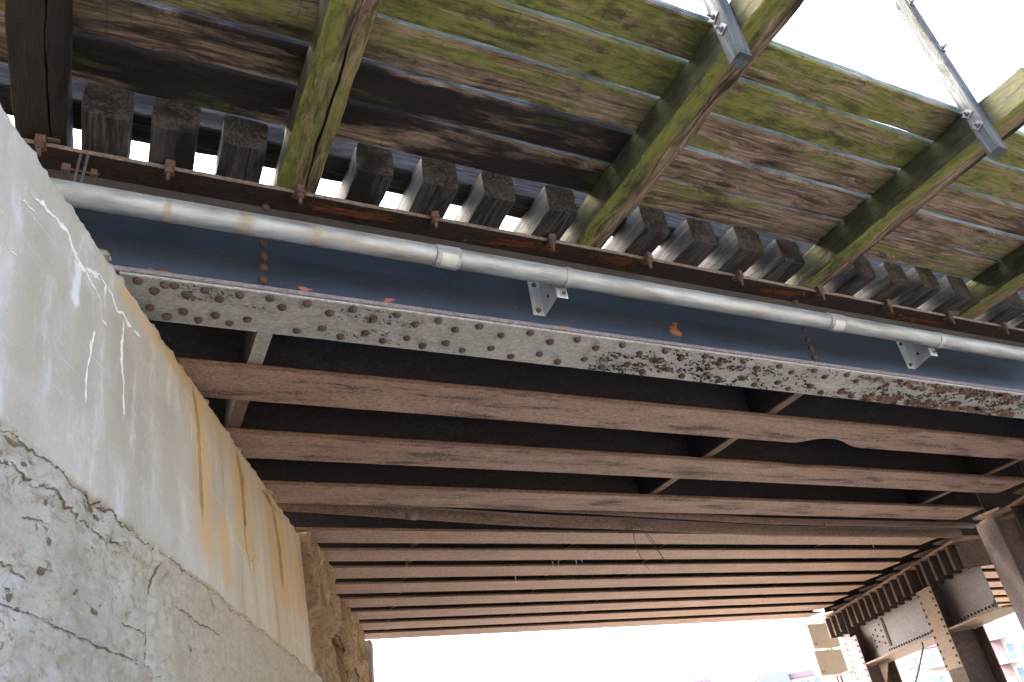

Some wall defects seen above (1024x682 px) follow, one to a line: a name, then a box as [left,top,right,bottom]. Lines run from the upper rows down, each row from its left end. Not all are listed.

rust [293,201,397,223]
leakage [0,251,51,387]
leakage [63,283,134,472]
rust [113,277,307,628]
rust [587,322,1024,418]
crack [0,430,314,677]